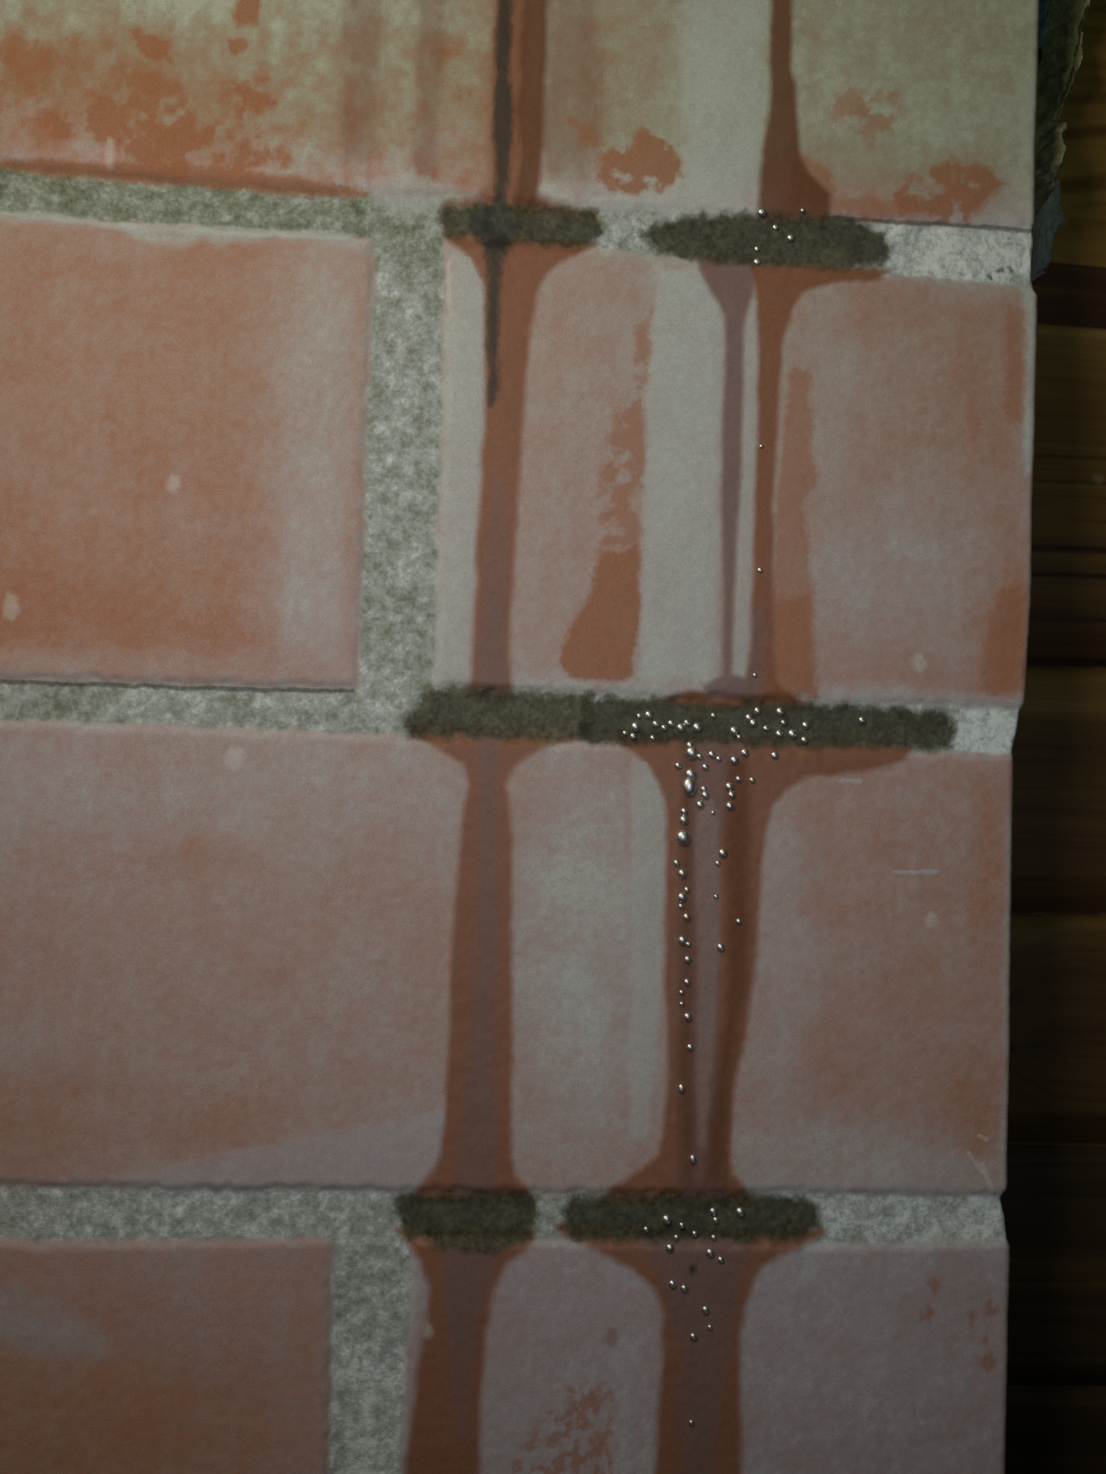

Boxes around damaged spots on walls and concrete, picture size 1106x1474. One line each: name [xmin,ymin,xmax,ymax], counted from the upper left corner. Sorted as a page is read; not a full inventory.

damp [112,0,958,1474]